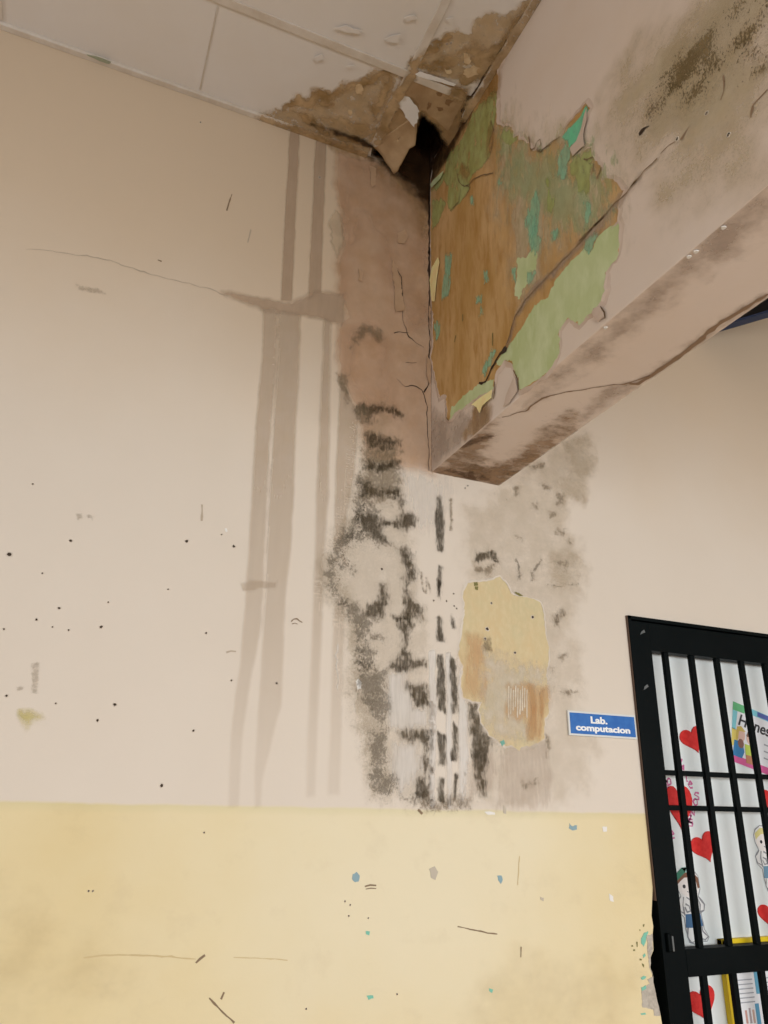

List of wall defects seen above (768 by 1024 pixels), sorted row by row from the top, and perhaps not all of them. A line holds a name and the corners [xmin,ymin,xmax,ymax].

water stain [618,0,768,157]
crack [33,249,225,296]
water stain [227,0,572,502]
peeling [429,57,629,424]
crack [479,125,690,385]
water stain [360,514,415,542]
water stain [435,498,451,552]
water stain [476,551,498,571]
water stain [363,548,490,808]
peeling [457,575,551,752]